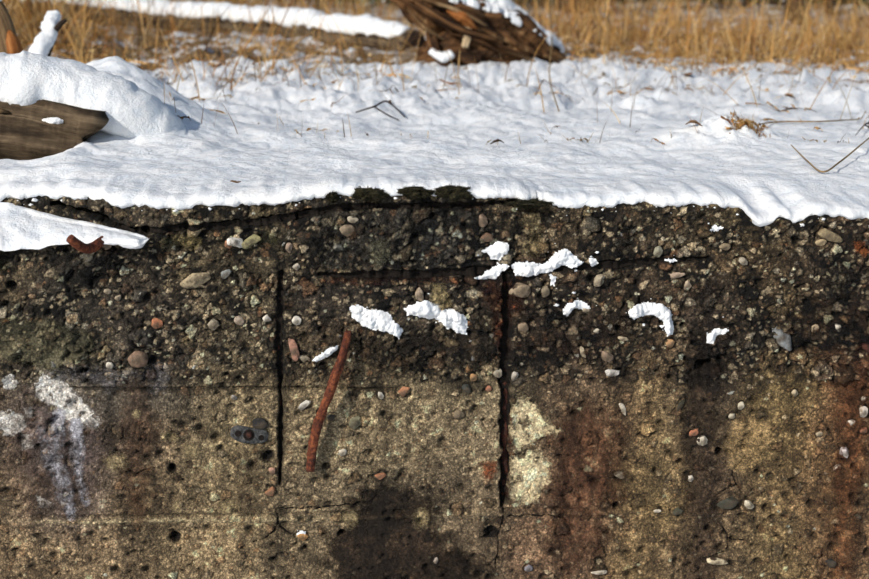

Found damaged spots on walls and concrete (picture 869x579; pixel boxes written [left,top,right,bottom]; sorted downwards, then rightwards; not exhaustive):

crack [553,256,707,271]
damp [0,365,168,526]
crack [275,271,285,481]
rust [306,328,351,472]
crack [319,265,567,568]
rust [547,399,627,575]
damp [679,281,735,579]
rust [823,348,869,579]